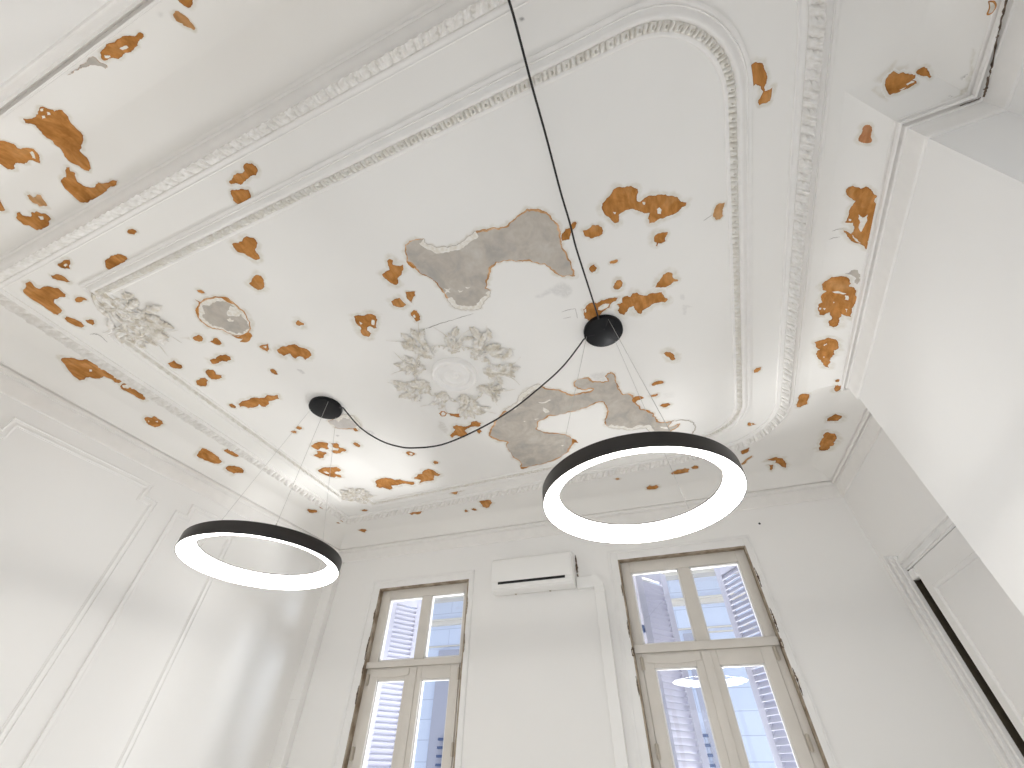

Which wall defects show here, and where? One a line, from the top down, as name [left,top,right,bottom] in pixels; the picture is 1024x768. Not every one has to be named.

peeling [69,28,149,75]
peeling [750,54,779,111]
peeling [870,57,936,104]
peeling [0,104,121,206]
peeling [837,182,879,252]
peeling [18,255,99,331]
spalling [345,179,694,343]
spalling [179,286,317,388]
peeling [809,270,860,394]
peeling [54,353,168,430]
peeling [225,392,284,411]
spalling [439,370,696,470]